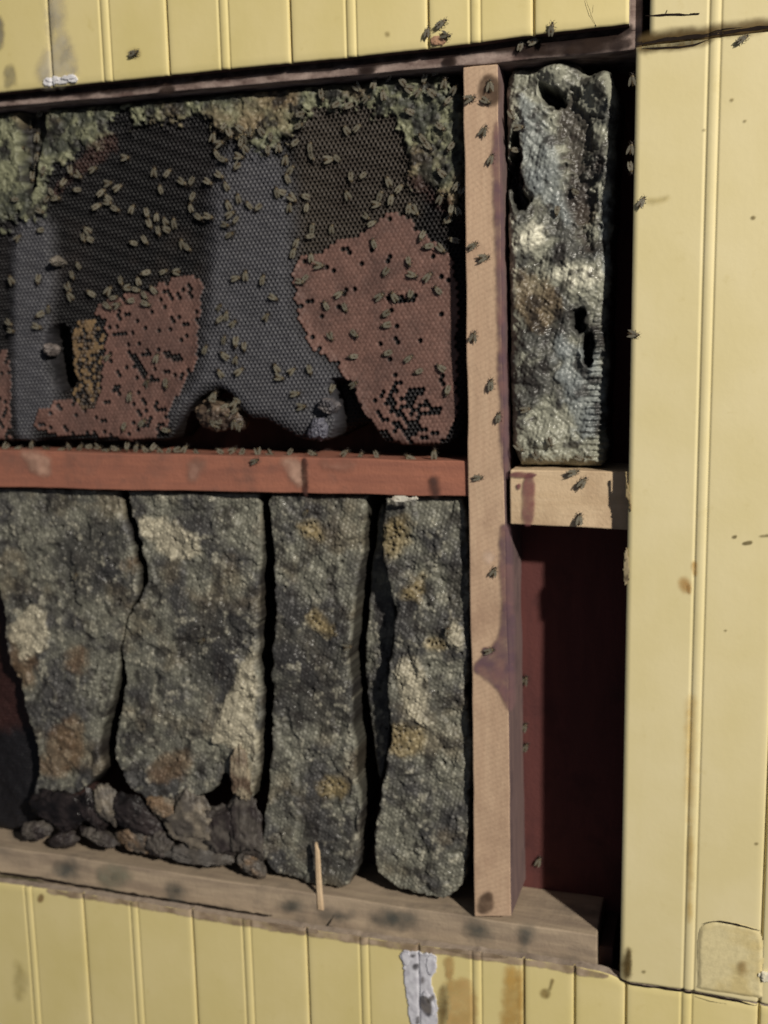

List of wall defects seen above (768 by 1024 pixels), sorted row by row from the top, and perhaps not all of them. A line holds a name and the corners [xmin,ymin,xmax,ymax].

spalling [47,889,608,1024]
water stain [438,958,475,1024]